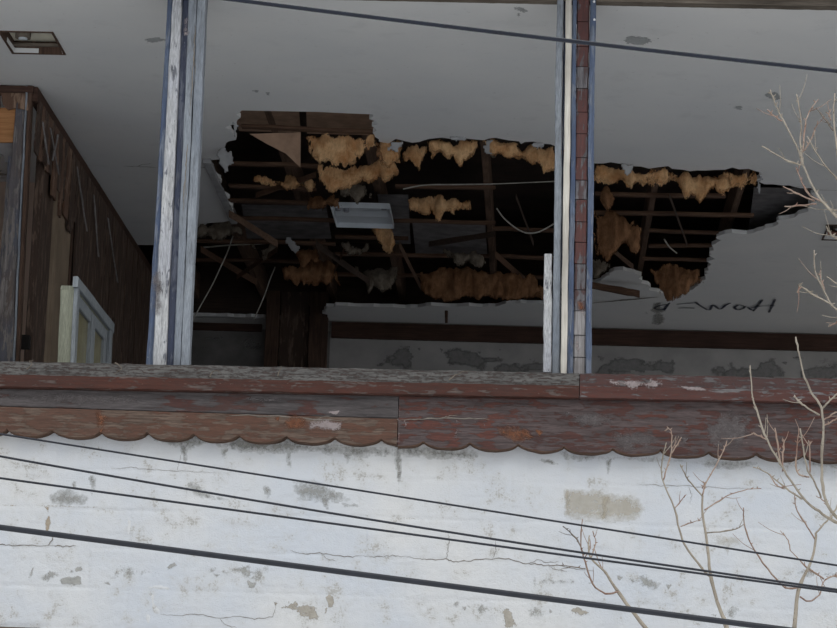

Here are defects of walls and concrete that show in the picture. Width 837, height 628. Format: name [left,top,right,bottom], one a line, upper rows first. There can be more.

flaking render [445,348,543,372]
flaking render [596,358,675,388]
flaking render [712,357,799,378]
peeling [276,410,341,430]
crack [291,535,590,572]